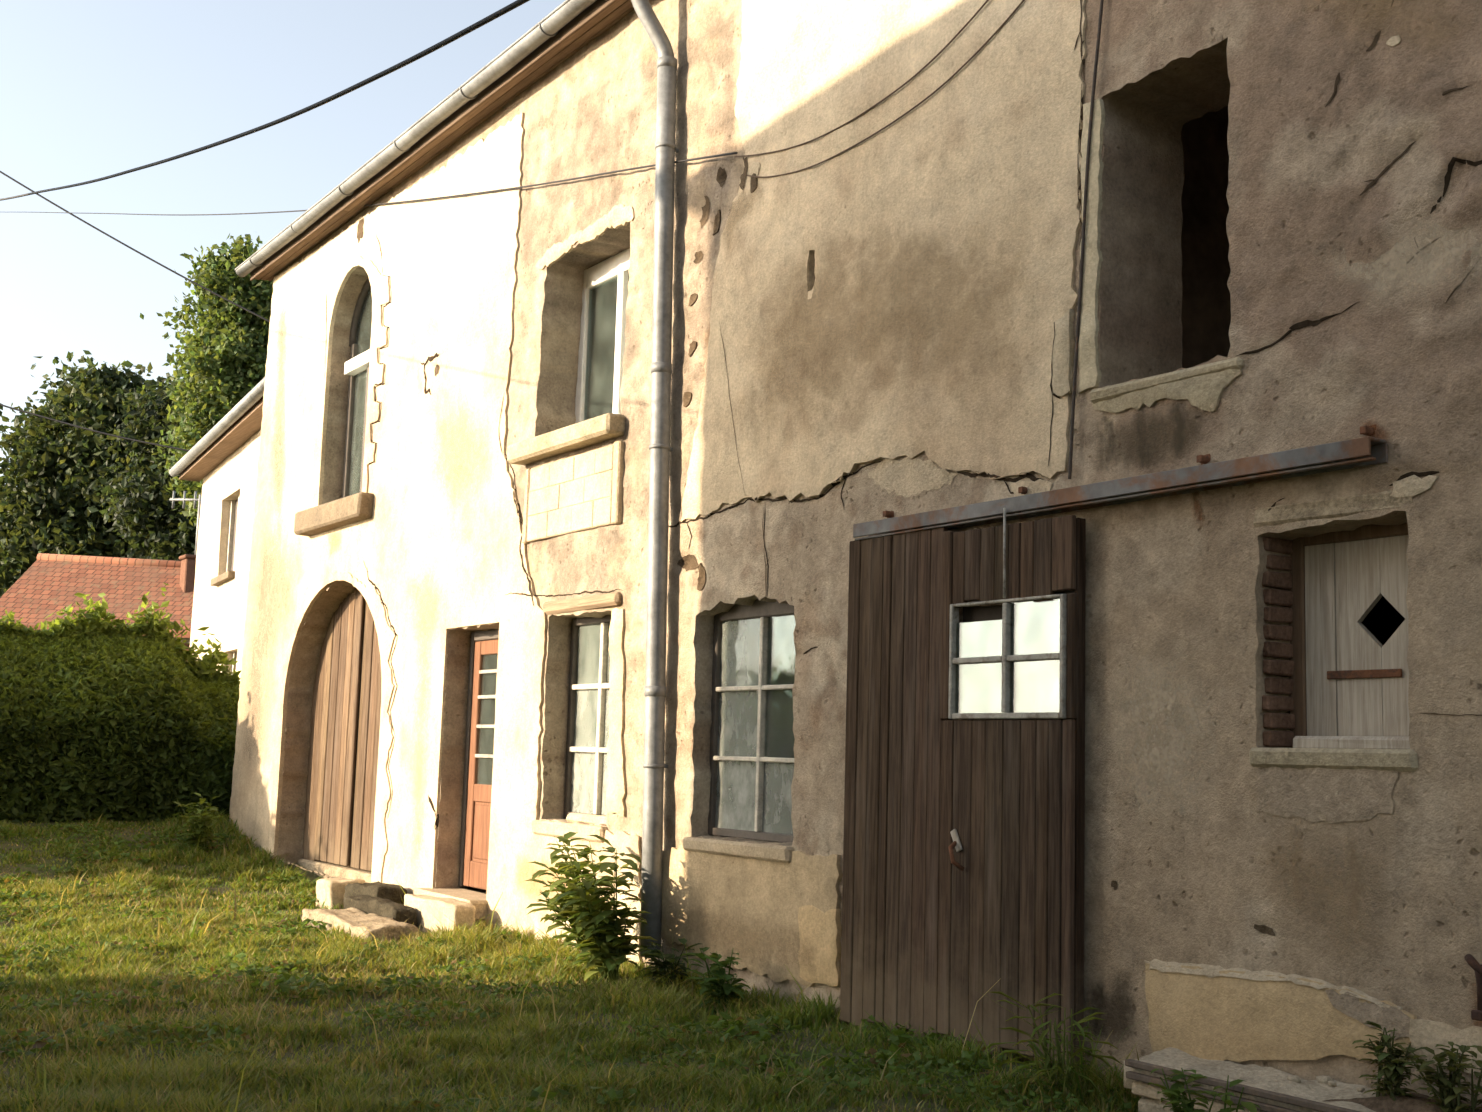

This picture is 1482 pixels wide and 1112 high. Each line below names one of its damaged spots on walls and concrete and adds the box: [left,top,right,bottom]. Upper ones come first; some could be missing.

spalling [699,157,761,236]
crack [1074,0,1085,292]
crack [1401,157,1482,270]
crack [1237,301,1360,356]
spalling [683,392,693,407]
crack [668,329,883,599]
crack [957,322,1060,494]
spalling [1092,369,1242,413]
crack [363,561,398,818]
crack [428,795,439,828]
flaking render [1144,959,1482,1074]